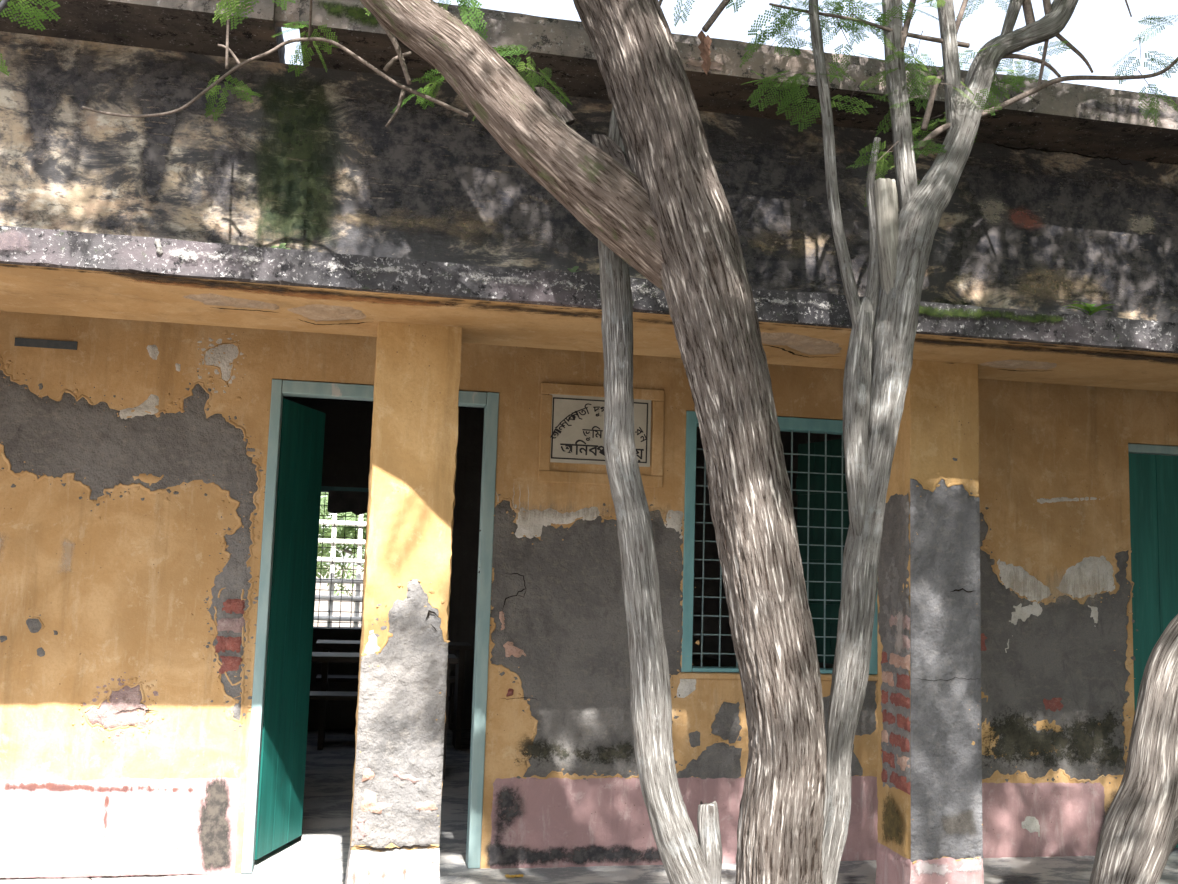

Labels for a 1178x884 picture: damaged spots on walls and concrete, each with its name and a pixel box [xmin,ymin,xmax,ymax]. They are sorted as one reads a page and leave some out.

water stain [11,42,261,243]
water stain [708,132,865,297]
water stain [954,160,1178,304]
peeling [0,330,266,731]
spalling [72,672,165,746]
water stain [198,777,231,870]
peeling [351,579,450,852]
peeling [478,494,639,784]
water stain [486,787,662,866]
peeling [648,498,744,779]
peeling [851,471,1138,864]
water stain [983,709,1123,768]